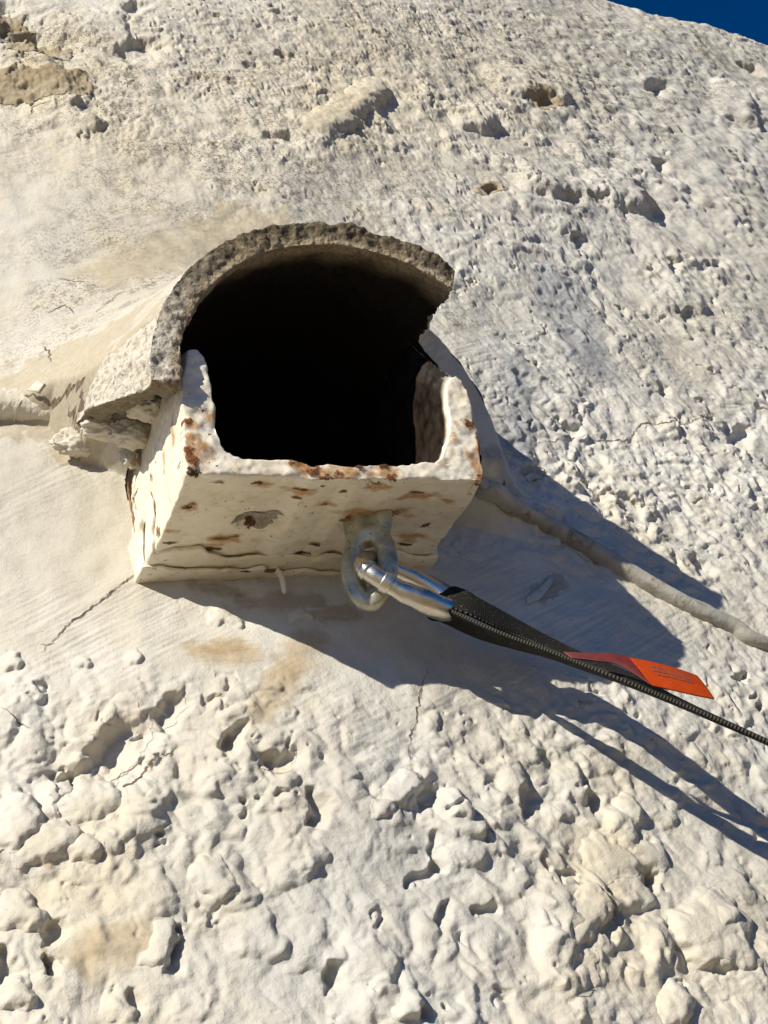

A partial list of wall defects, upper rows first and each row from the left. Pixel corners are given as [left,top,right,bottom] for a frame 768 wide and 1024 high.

spalling [0,13,97,106]
peeling [0,292,160,465]
rust [170,413,215,477]
rust [205,535,244,551]
rust [250,460,396,499]
rust [319,491,430,522]
rust [397,523,431,546]
crack [528,416,714,514]
crack [44,575,133,651]